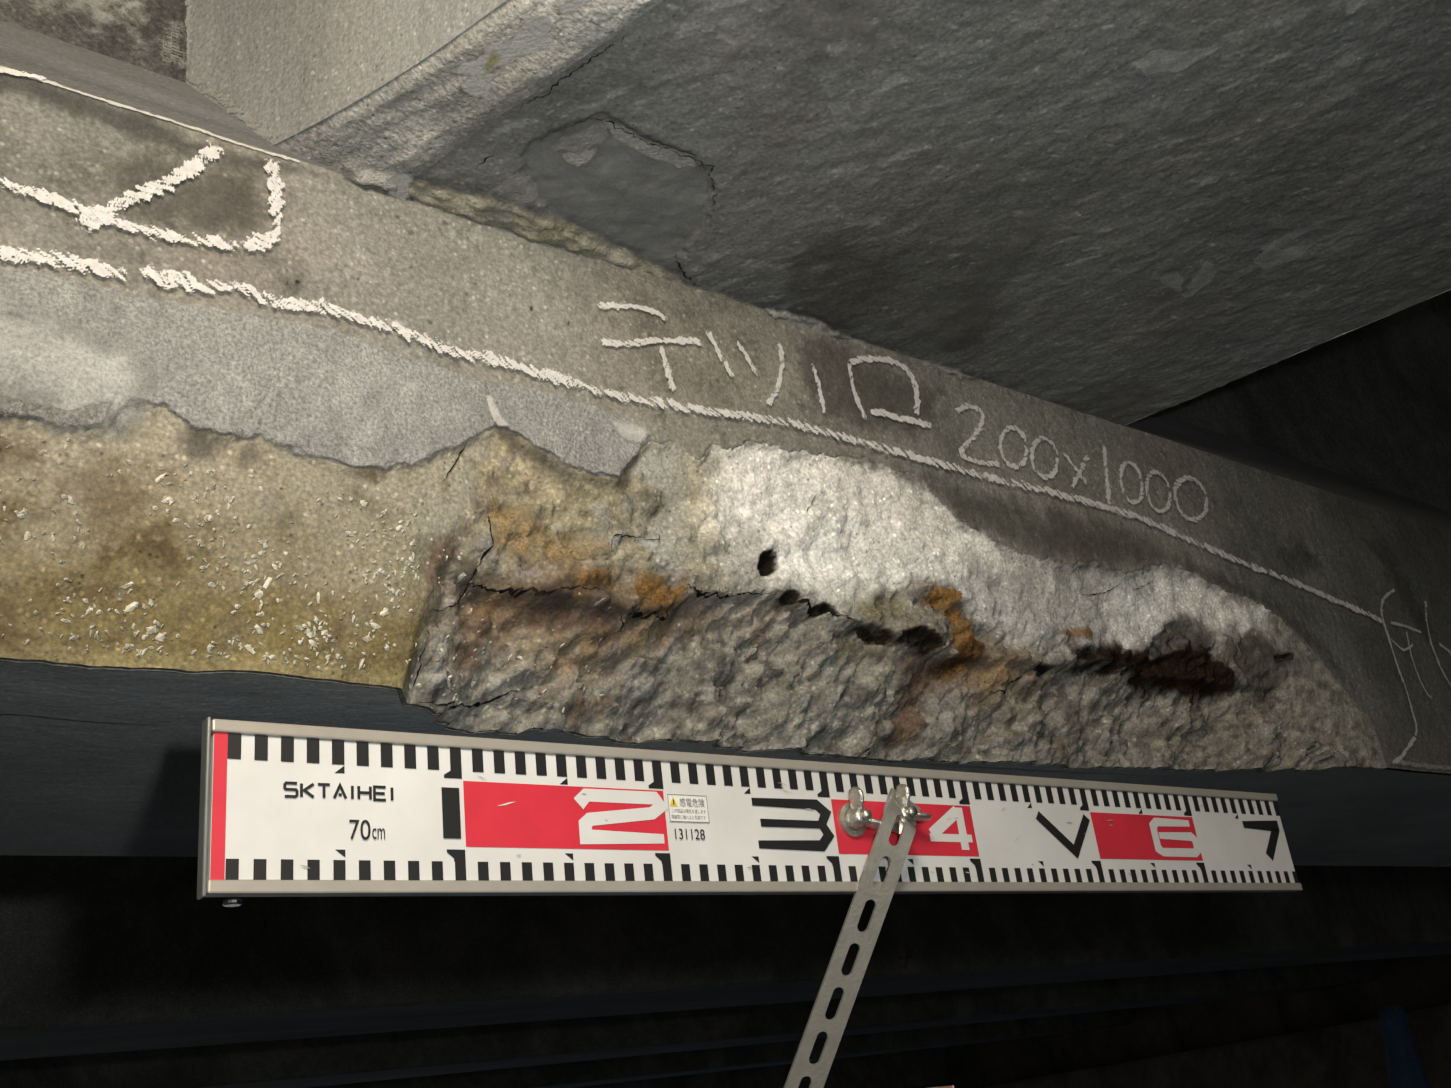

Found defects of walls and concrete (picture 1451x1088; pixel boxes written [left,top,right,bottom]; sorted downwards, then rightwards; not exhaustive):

peeling [498,112,709,279]
crack [408,648,541,710]
crack [431,508,859,632]
rust [635,575,689,607]
spalling [0,396,1383,773]
rust [858,594,906,622]
rust [890,587,983,745]
rust [1066,628,1236,705]